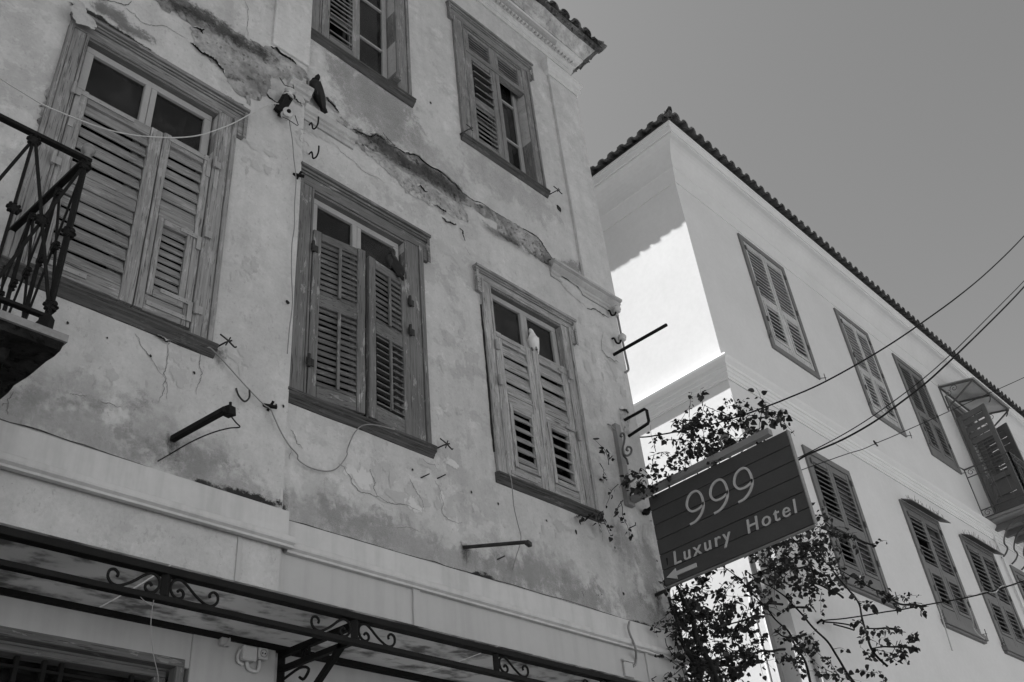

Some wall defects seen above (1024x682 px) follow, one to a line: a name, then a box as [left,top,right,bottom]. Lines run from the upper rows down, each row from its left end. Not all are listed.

flaking render [70,0,97,30]
flaking render [156,0,310,114]
flaking render [325,96,552,265]
crack [135,334,170,400]